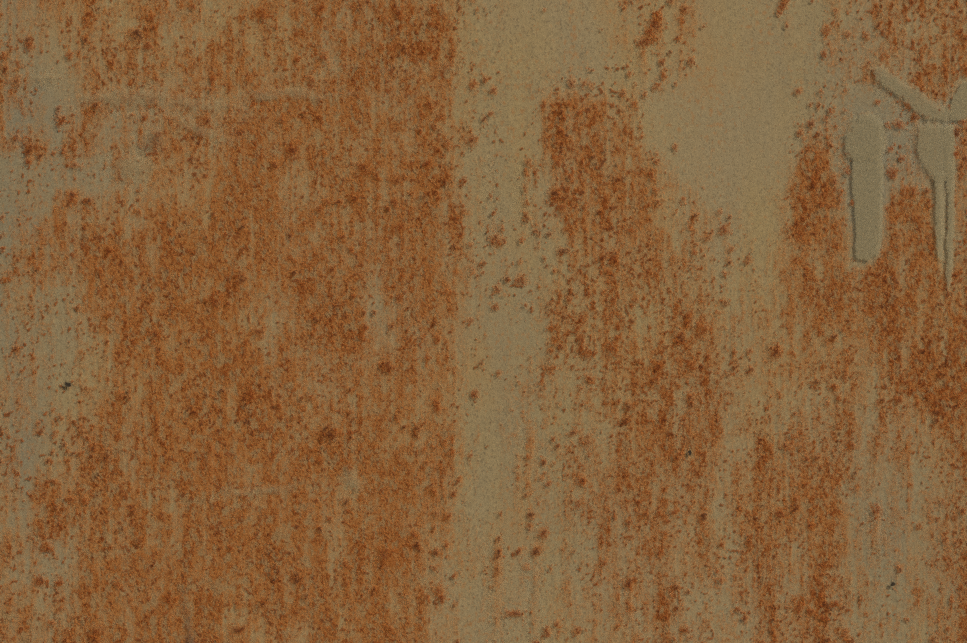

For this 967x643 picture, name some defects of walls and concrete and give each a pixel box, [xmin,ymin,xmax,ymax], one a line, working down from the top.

rust [0,0,549,643]